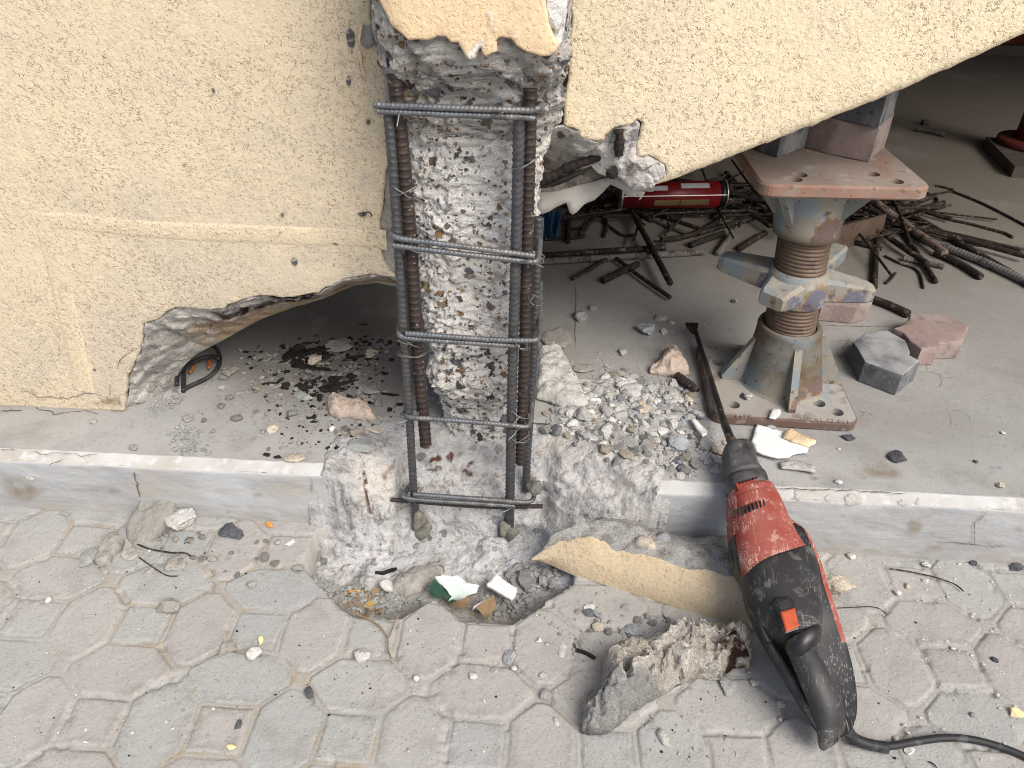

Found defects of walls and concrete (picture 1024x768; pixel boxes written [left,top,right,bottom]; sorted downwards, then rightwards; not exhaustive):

spalling [358,0,666,214]
spalling [125,171,407,412]
rust [385,50,453,471]
rust [515,88,538,466]
peeling [542,326,574,348]